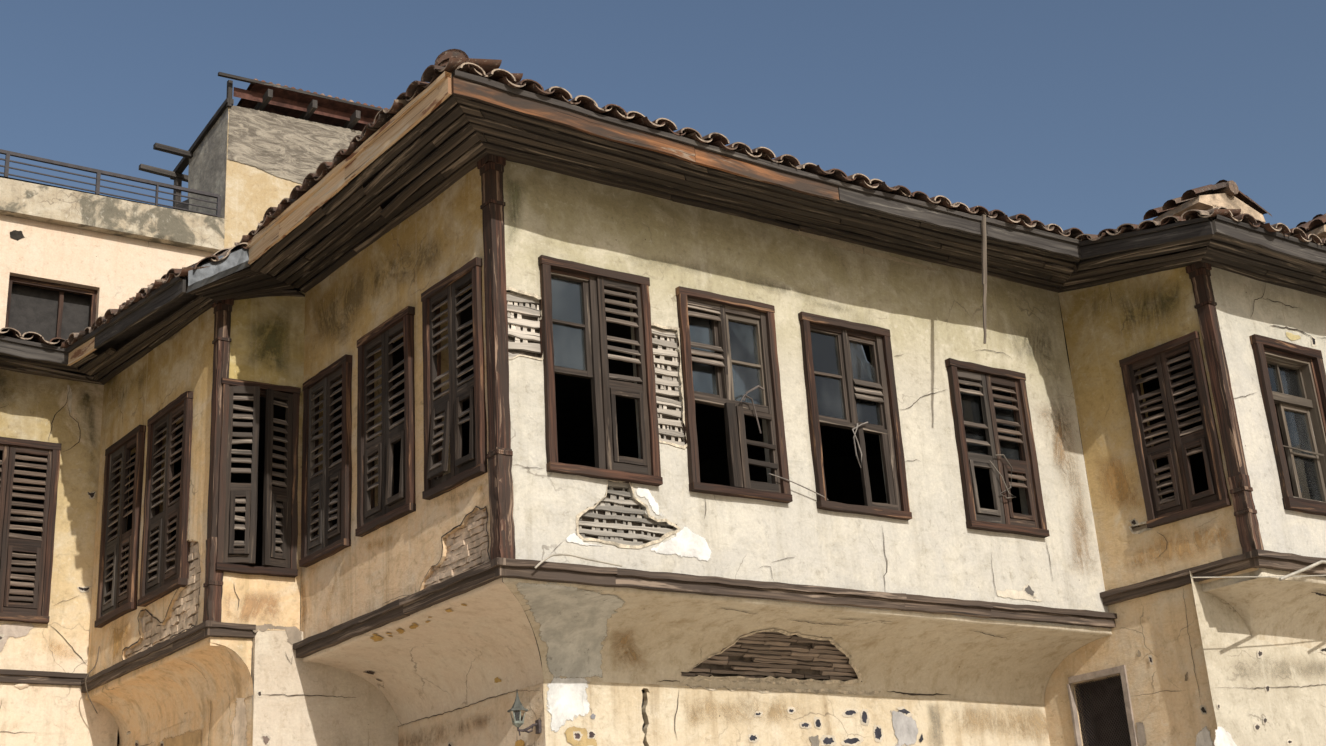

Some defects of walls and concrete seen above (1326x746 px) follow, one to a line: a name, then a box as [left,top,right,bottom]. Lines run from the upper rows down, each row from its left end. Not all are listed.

crack [1250,285,1326,340]
spalling [419,506,490,590]
spalling [566,480,712,561]
spalling [122,540,201,660]
peeling [158,730,201,746]
spalling [680,628,884,746]
peeling [1196,705,1237,746]